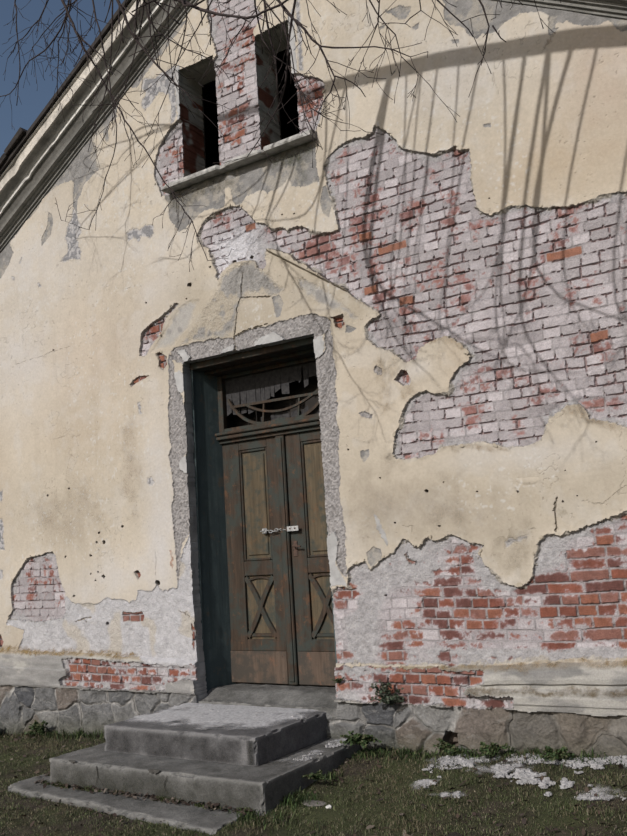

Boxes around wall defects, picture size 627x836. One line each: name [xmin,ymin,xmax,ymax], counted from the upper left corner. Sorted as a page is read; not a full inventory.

peeling [0,99,121,282]
crack [233,272,271,350]
spalling [126,0,627,460]
spalling [360,449,370,463]
spalling [0,533,197,693]
spalling [331,511,627,695]